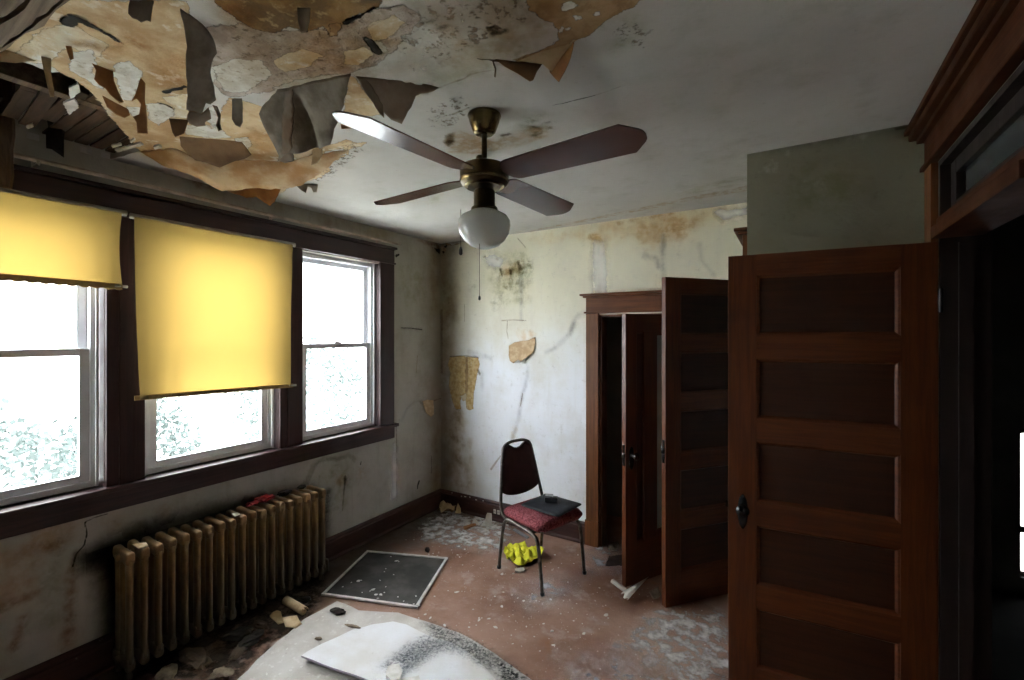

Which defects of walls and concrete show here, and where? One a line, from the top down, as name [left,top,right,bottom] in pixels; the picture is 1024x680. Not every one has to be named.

peeling [559,1,600,33]
flaking render [6,0,517,162]
flaking render [293,139,367,181]
peeling [509,337,536,363]
flaking render [448,356,480,410]
crack [72,514,106,567]